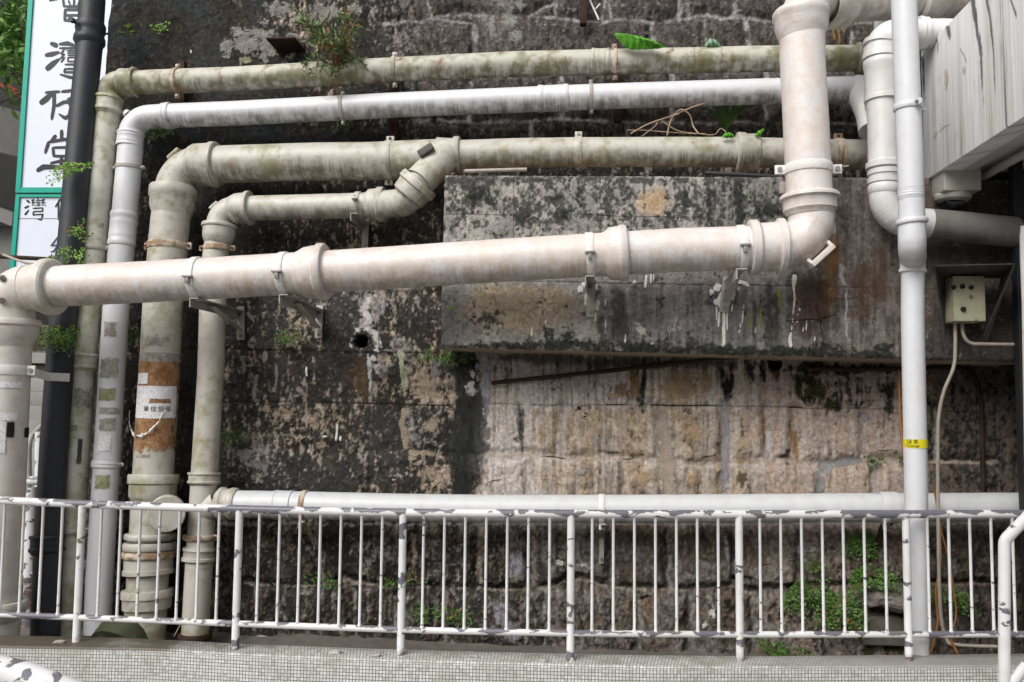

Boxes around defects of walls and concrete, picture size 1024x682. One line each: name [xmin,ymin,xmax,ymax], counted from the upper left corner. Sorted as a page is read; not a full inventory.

peeling [220,1,363,59]
damp [463,186,495,213]
damp [548,185,582,221]
damp [705,184,713,224]
damp [732,180,781,223]
damp [450,264,901,494]